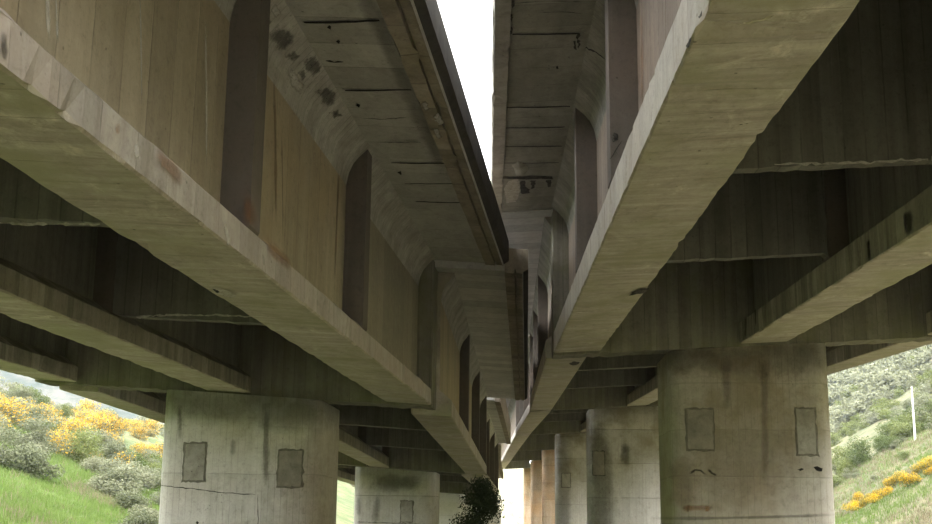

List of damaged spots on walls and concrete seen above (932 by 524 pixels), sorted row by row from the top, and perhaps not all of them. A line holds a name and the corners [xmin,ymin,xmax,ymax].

spalling [503,175,553,203]